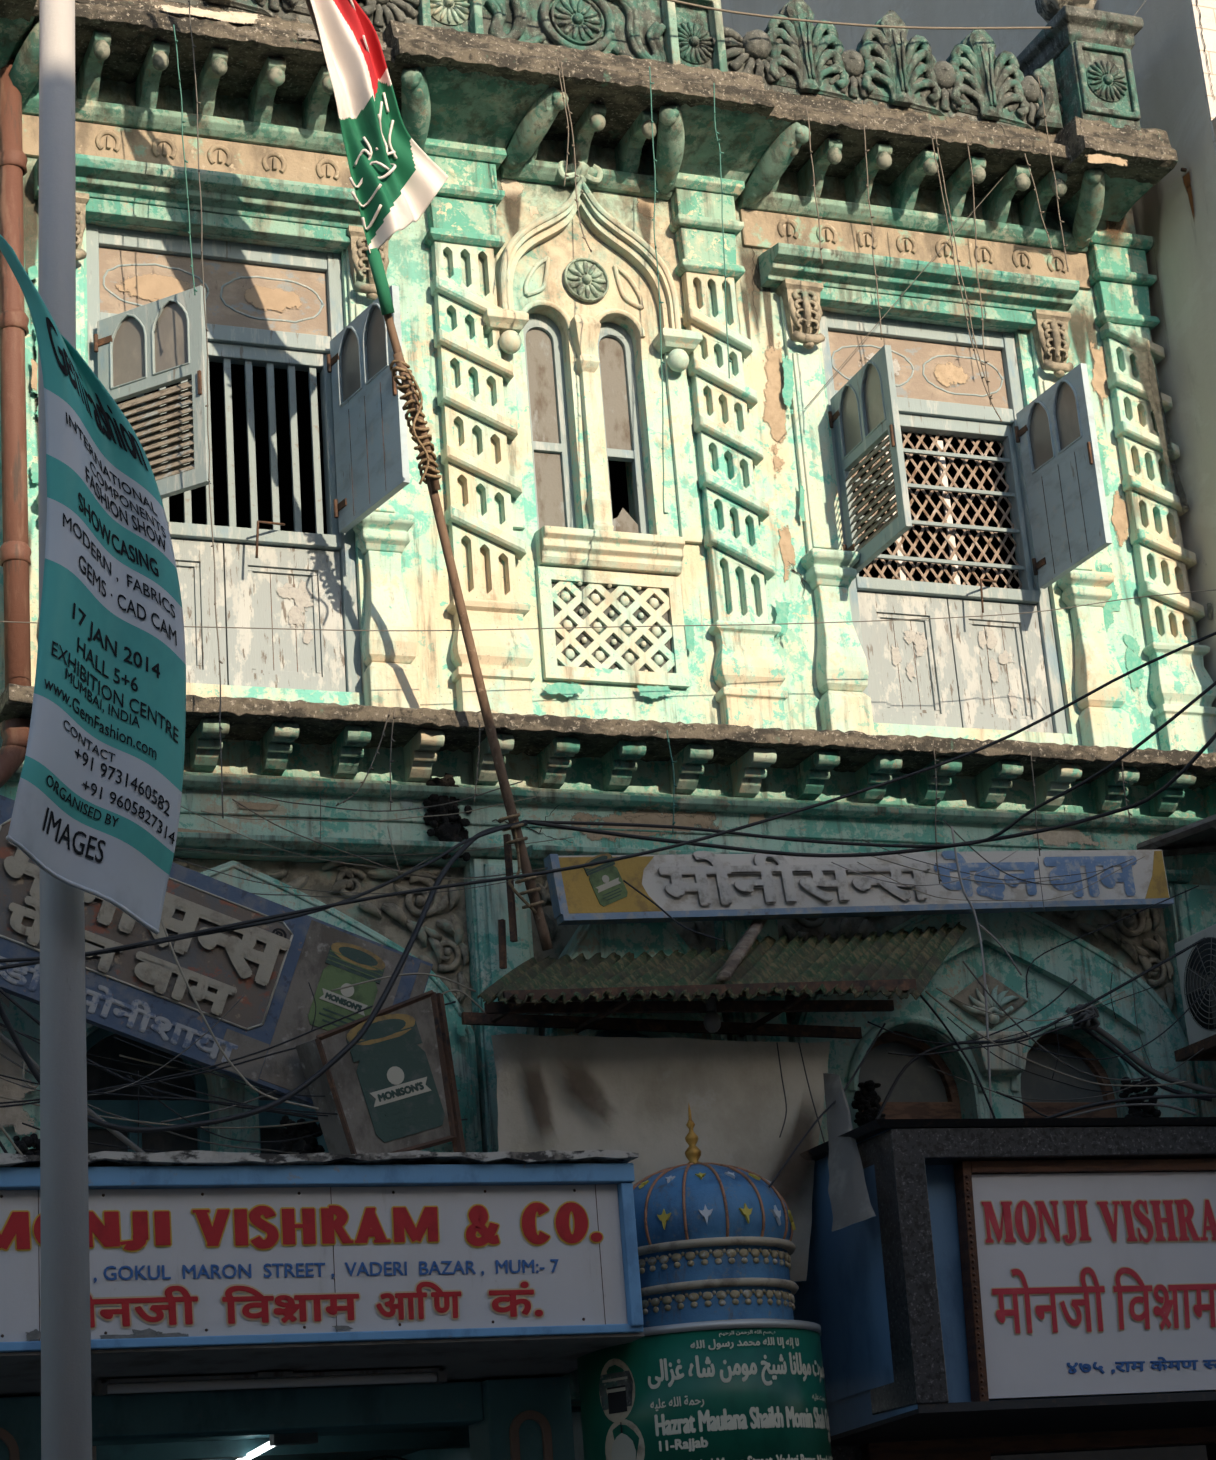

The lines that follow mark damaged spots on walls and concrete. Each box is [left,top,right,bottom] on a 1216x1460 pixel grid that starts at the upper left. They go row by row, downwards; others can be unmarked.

peeling [155,5,270,25]
spalling [1087,154,1128,166]
peeling [763,333,794,478]
peeling [1090,341,1110,416]
peeling [1097,435,1129,547]
peeling [778,482,805,582]
peeling [775,599,790,643]
peeling [1097,563,1144,691]
leakage [524,1069,552,1130]